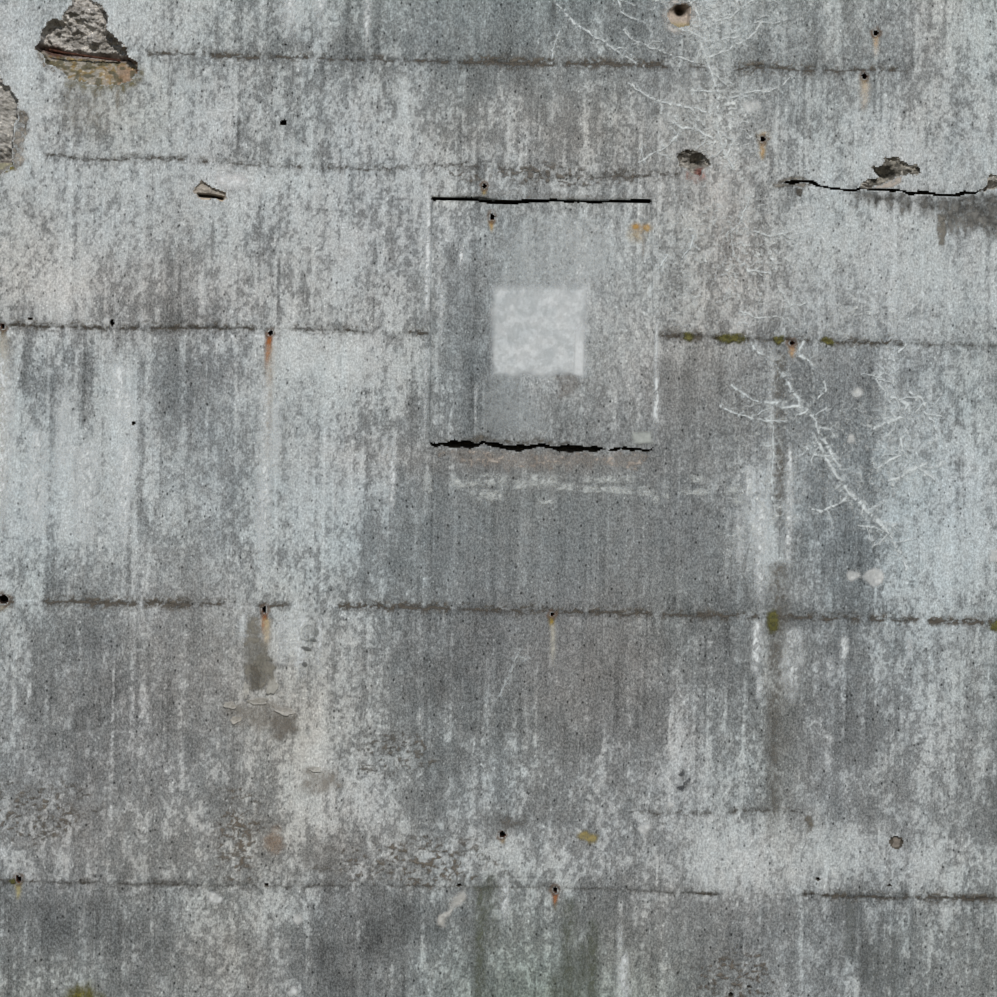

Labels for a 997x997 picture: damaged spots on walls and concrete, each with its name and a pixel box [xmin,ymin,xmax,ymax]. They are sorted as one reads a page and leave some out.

spalling [35,0,143,95]
spalling [0,78,29,175]
spalling [193,179,227,201]
crack [773,176,989,197]
spalling [856,157,997,245]
rust [265,328,275,361]
crack [430,435,654,470]